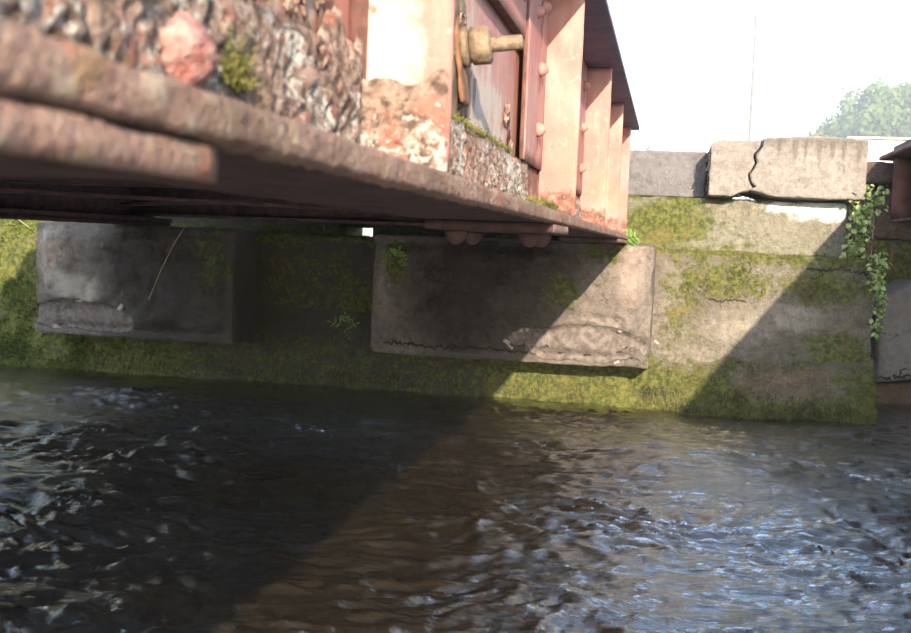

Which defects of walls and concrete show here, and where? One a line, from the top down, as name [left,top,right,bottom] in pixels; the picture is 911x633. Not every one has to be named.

peeling [256,0,356,74]
crack [704,139,762,197]
crack [383,340,639,360]
spalling [503,324,659,365]